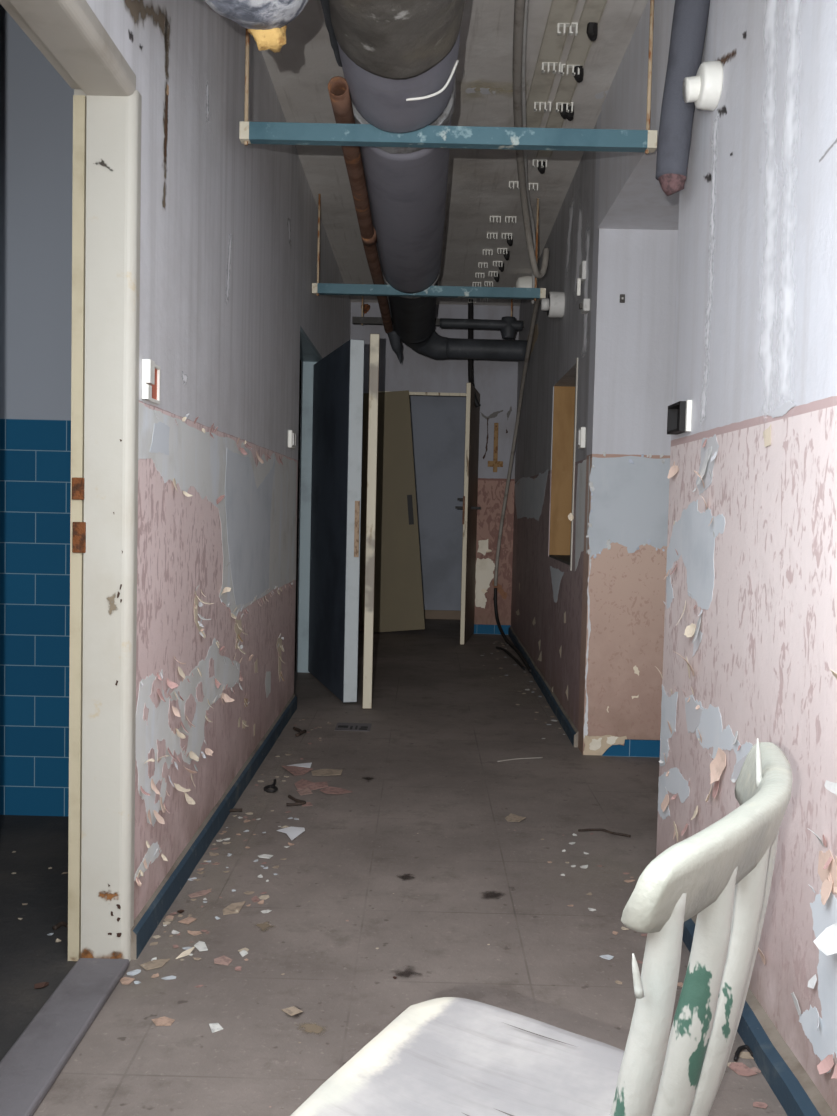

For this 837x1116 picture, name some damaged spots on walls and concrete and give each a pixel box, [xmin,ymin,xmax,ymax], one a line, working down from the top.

spalling [107,584,122,614]
peeling [135,399,297,827]
peeling [475,539,495,608]
peeling [550,434,753,841]
peeling [824,780,837,795]
corrosion [99,884,122,937]
corrosion [80,949,123,959]
peeling [791,828,837,1079]